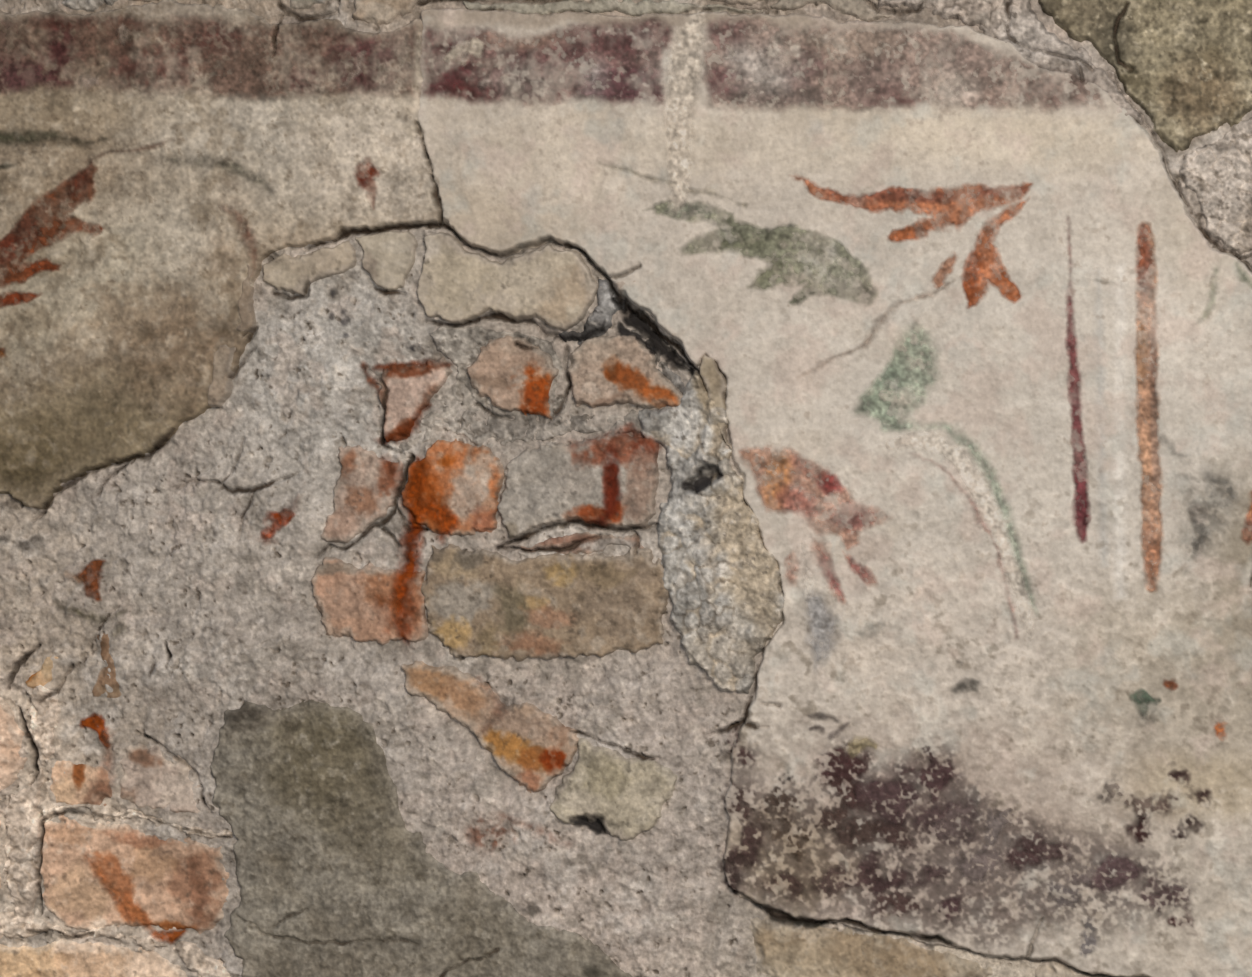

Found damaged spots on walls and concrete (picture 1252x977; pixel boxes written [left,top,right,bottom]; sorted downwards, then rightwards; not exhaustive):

crack [313,189,453,247]
crack [1198,226,1252,271]
crack [376,288,400,296]
crack [433,312,547,349]
crack [643,315,696,369]
spalling [236,230,785,841]
spalling [0,656,233,977]
peeling [721,746,1067,918]
peeling [1099,783,1178,842]
peeling [1169,771,1210,802]
peeling [1050,856,1189,926]
crack [826,919,886,932]